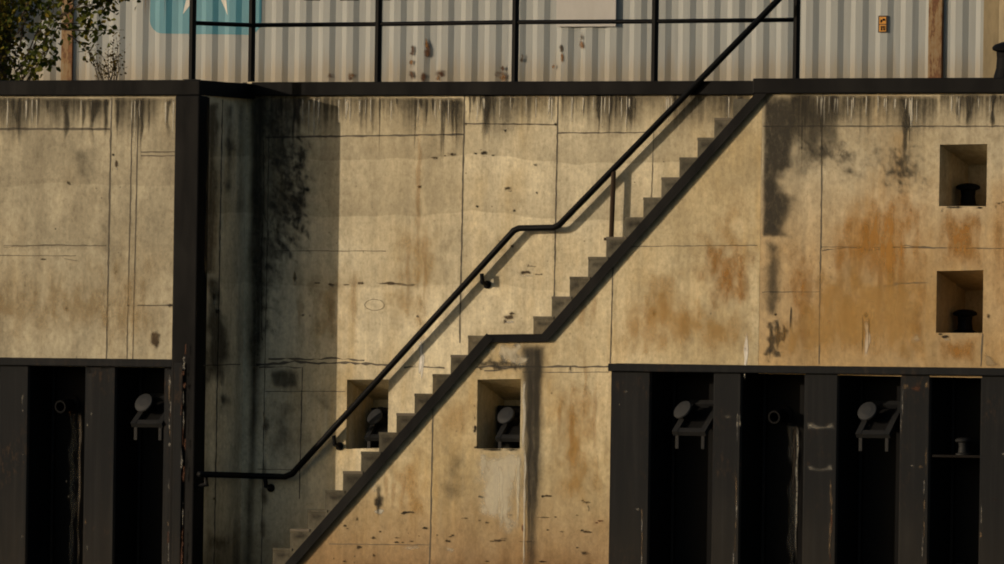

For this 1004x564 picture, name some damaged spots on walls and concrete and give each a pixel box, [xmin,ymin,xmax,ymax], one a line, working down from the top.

corrosion [409,40,444,81]
water stain [0,98,174,142]
water stain [666,95,749,118]
water stain [250,95,653,441]
corrosion [846,206,910,276]
water stain [763,95,1004,357]
water stain [479,344,543,564]